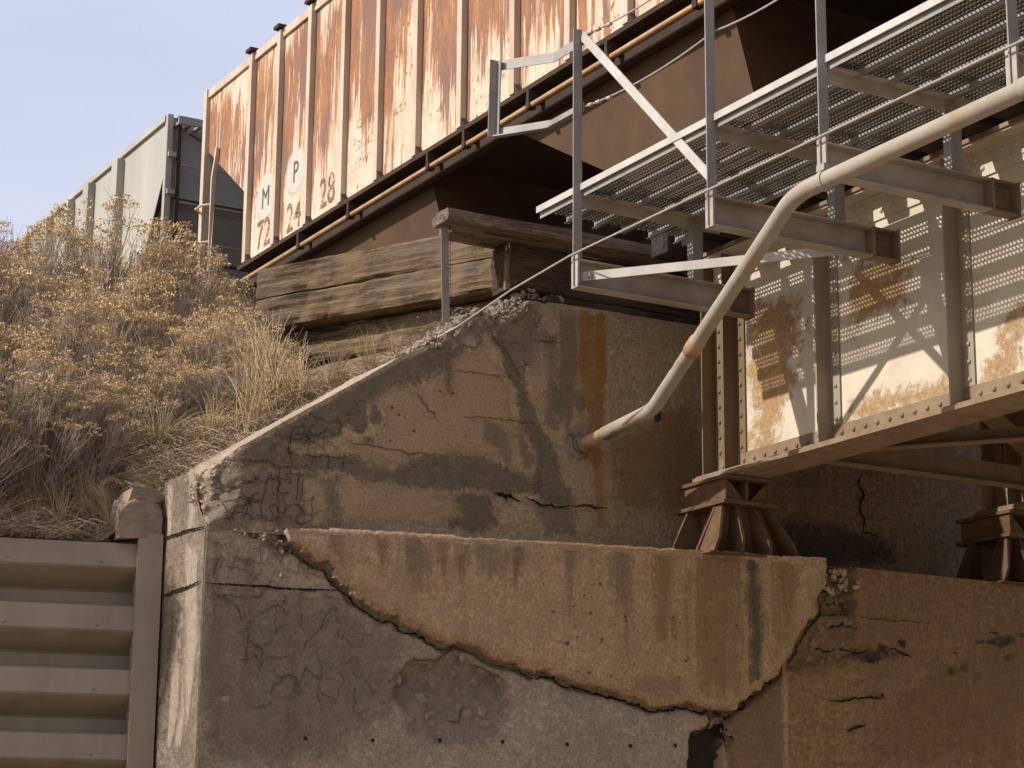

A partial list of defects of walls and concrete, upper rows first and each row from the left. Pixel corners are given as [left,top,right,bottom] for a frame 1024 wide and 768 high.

rust [843,256,914,339]
rust [746,297,809,449]
rust [979,302,1024,383]
damp [491,334,589,535]
rust [580,312,605,526]
crack [161,412,504,714]
damp [449,492,523,577]
crack [493,492,607,509]
spalling [803,567,861,663]
crack [809,616,924,657]
spalling [687,711,731,768]
crack [829,693,885,703]